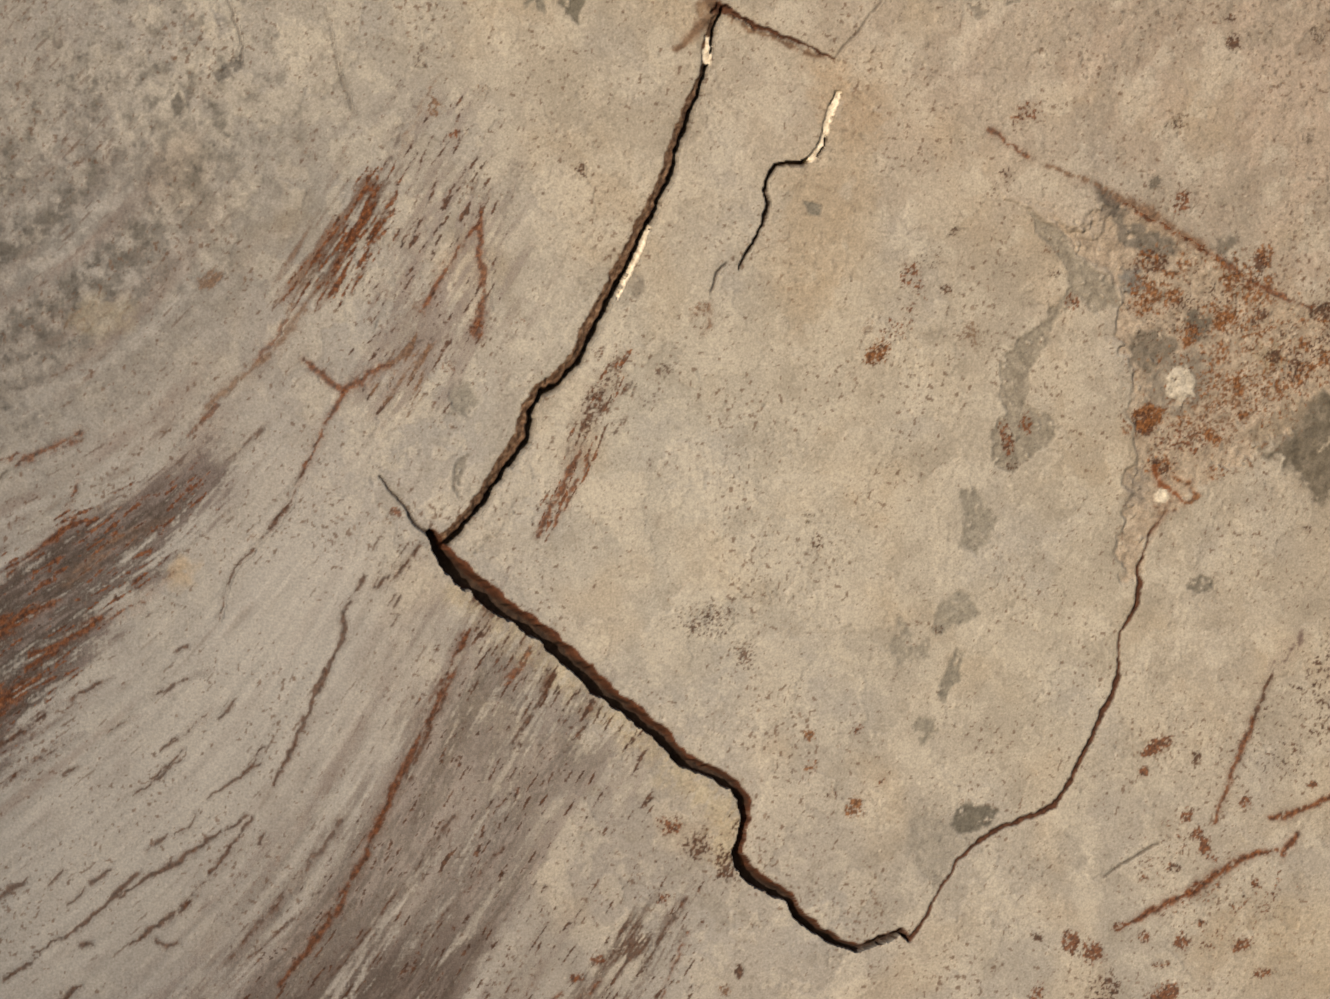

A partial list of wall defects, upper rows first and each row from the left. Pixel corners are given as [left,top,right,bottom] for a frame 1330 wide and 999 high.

corrosion [574,161,587,177]
corrosion [0,43,536,804]
corrosion [491,344,674,594]
crack [377,0,1167,953]
peeling [989,192,1330,585]
corrosion [0,506,744,999]
corrosion [1026,979,1050,999]
corrosion [1031,617,1330,999]